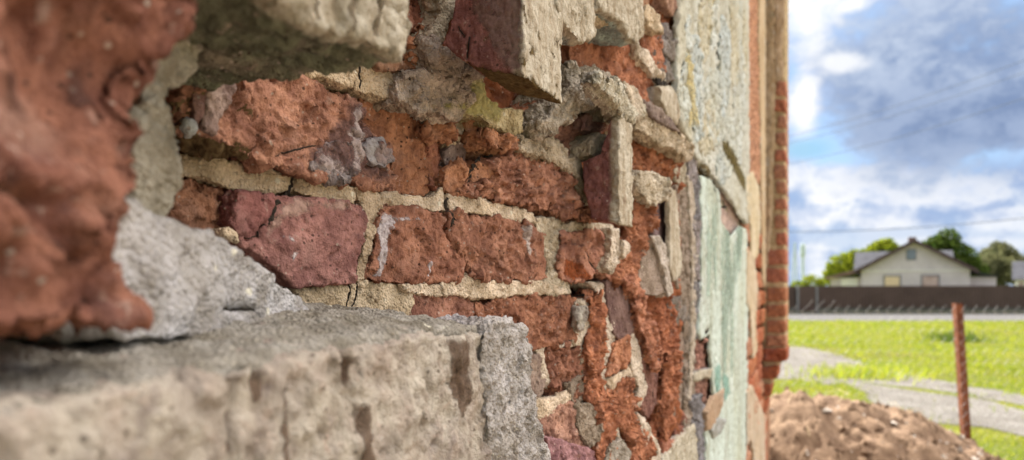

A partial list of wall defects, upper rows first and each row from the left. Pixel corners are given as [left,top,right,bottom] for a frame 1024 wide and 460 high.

crack [244,145,316,239]
crack [346,283,358,307]
peeling [707,206,743,399]